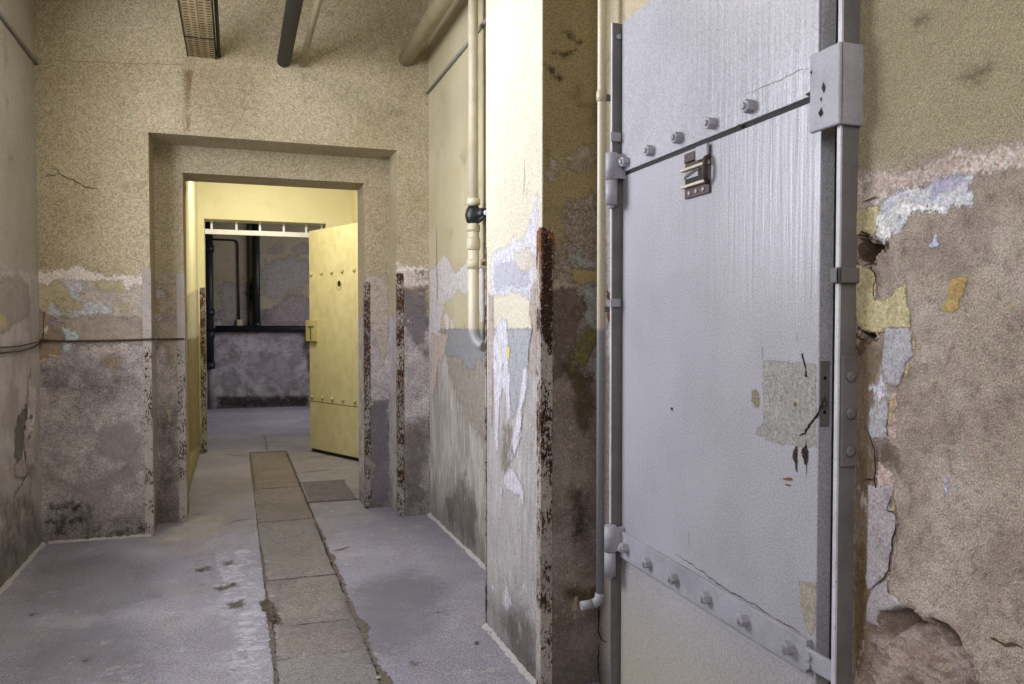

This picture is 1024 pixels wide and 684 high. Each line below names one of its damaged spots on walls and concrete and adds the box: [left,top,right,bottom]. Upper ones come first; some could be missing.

crack [46,169,99,191]
peeling [38,263,143,363]
peeling [363,192,539,442]
corrosion [536,227,555,352]
peeling [856,140,1024,441]
crack [866,427,896,588]
spalling [855,462,979,684]